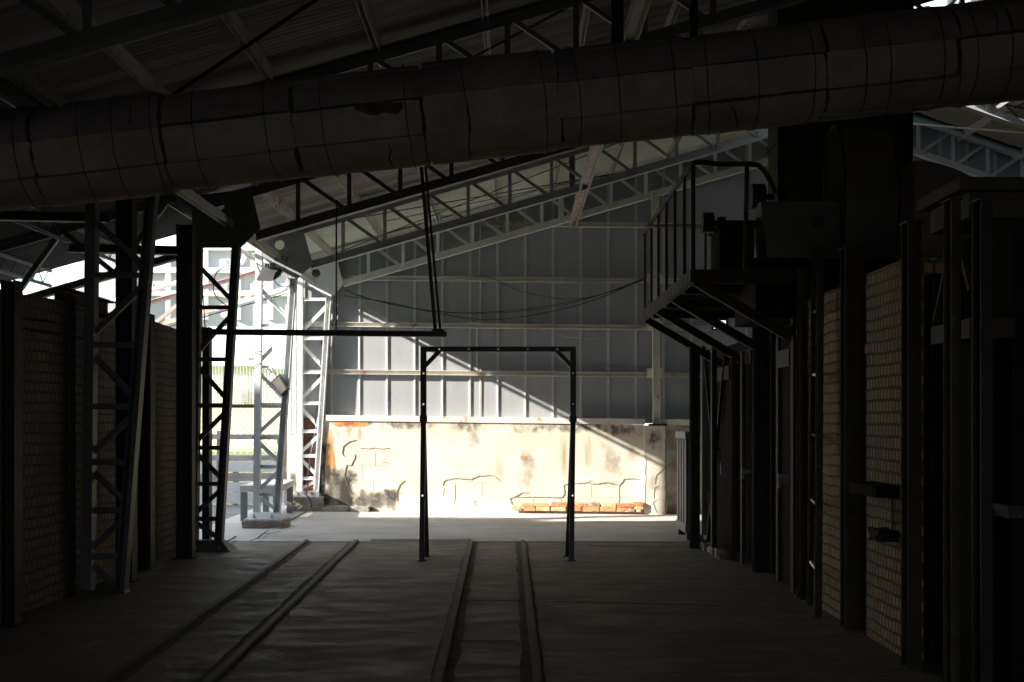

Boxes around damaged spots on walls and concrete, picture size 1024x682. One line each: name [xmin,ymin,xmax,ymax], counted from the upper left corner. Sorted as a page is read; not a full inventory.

corrosion [324,421,367,472]
damp [321,444,398,509]